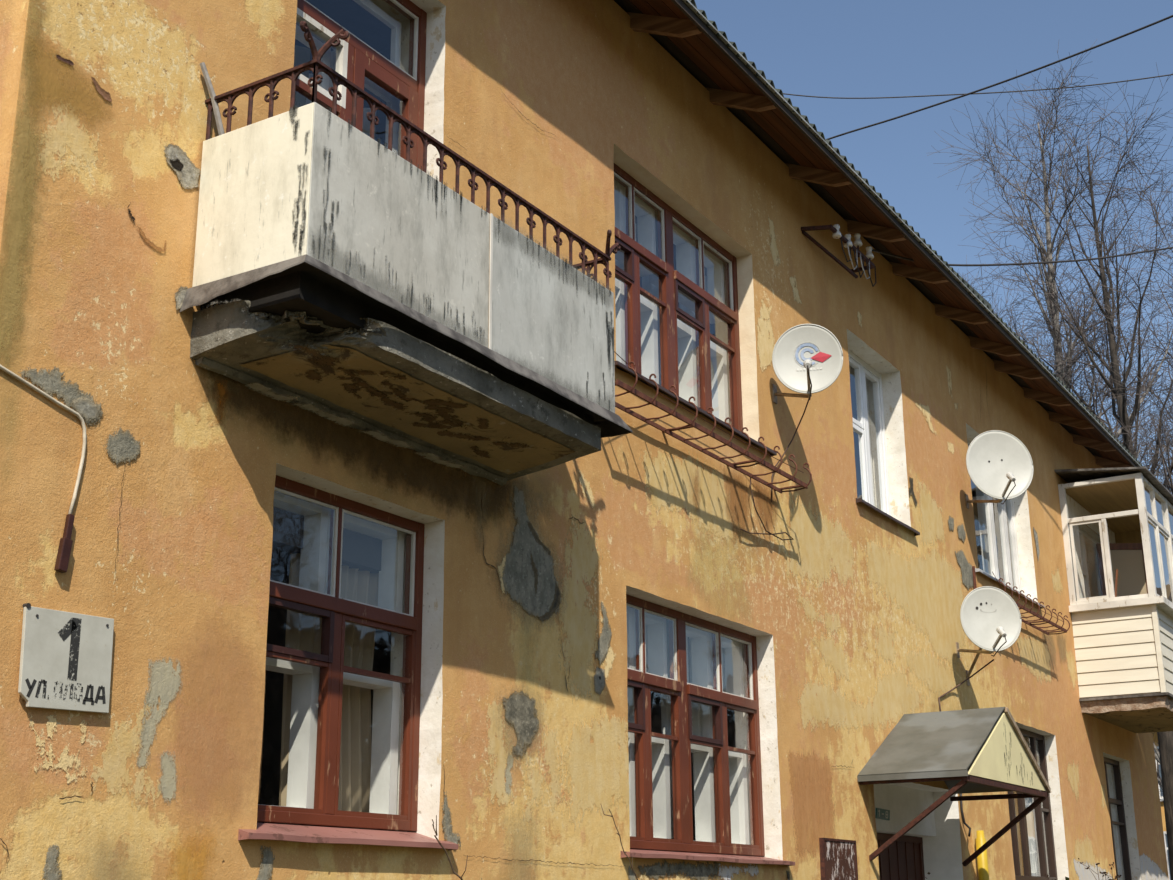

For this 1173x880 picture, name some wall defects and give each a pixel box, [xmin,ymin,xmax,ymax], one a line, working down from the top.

spalling [164,144,201,189]
water stain [289,106,366,275]
water stain [410,161,462,208]
water stain [401,284,482,338]
spalling [245,383,463,468]
water stain [208,370,511,518]
peeling [288,344,532,458]
peeling [578,471,596,508]
peeling [498,486,615,702]
peeling [29,658,182,811]
peeling [486,690,629,828]